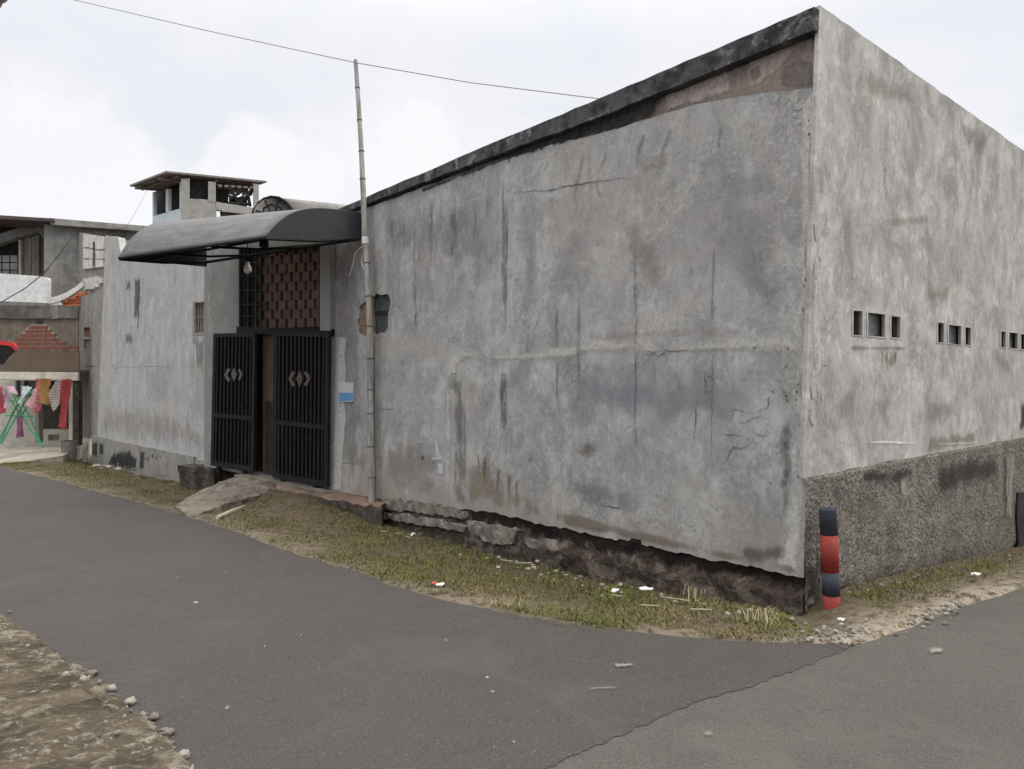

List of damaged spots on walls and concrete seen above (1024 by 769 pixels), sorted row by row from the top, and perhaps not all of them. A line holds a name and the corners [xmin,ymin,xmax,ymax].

crack [508,177,625,196]
flaking render [359,297,376,335]
damp [445,381,536,510]
crack [633,350,770,462]